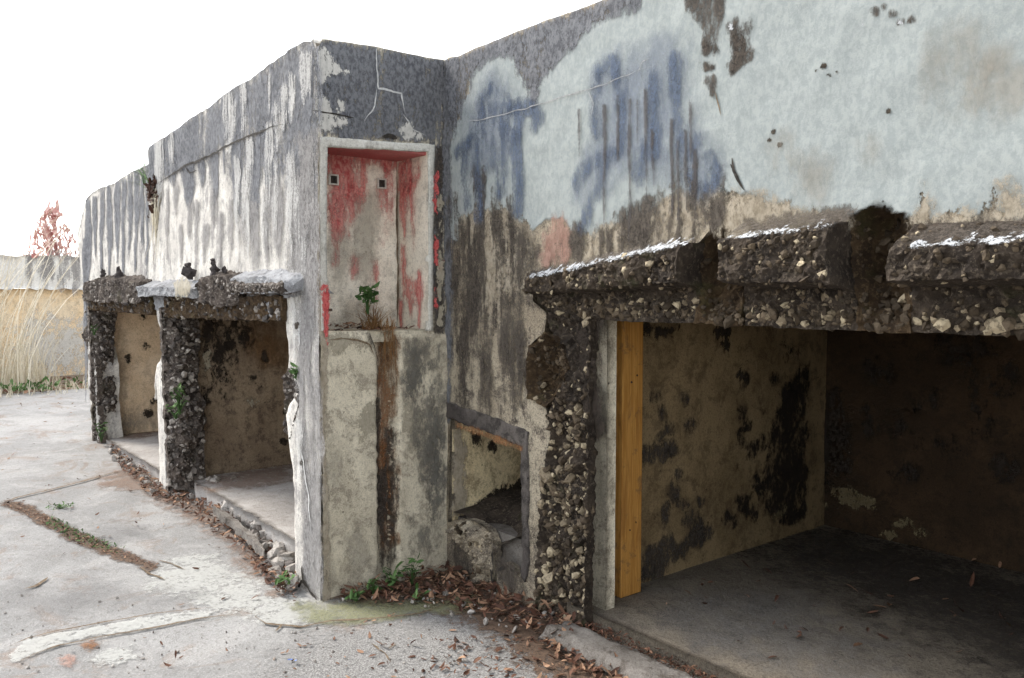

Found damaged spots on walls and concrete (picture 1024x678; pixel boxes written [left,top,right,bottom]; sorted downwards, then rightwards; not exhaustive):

crack [313,49,422,134]
crack [457,58,651,124]
peeling [684,0,754,97]
water stain [25,0,641,597]
rust [377,335,401,553]
spalling [451,428,489,586]
water stain [643,322,680,341]
water stain [713,326,732,352]
spalling [522,200,1024,625]
water stain [641,364,1024,677]